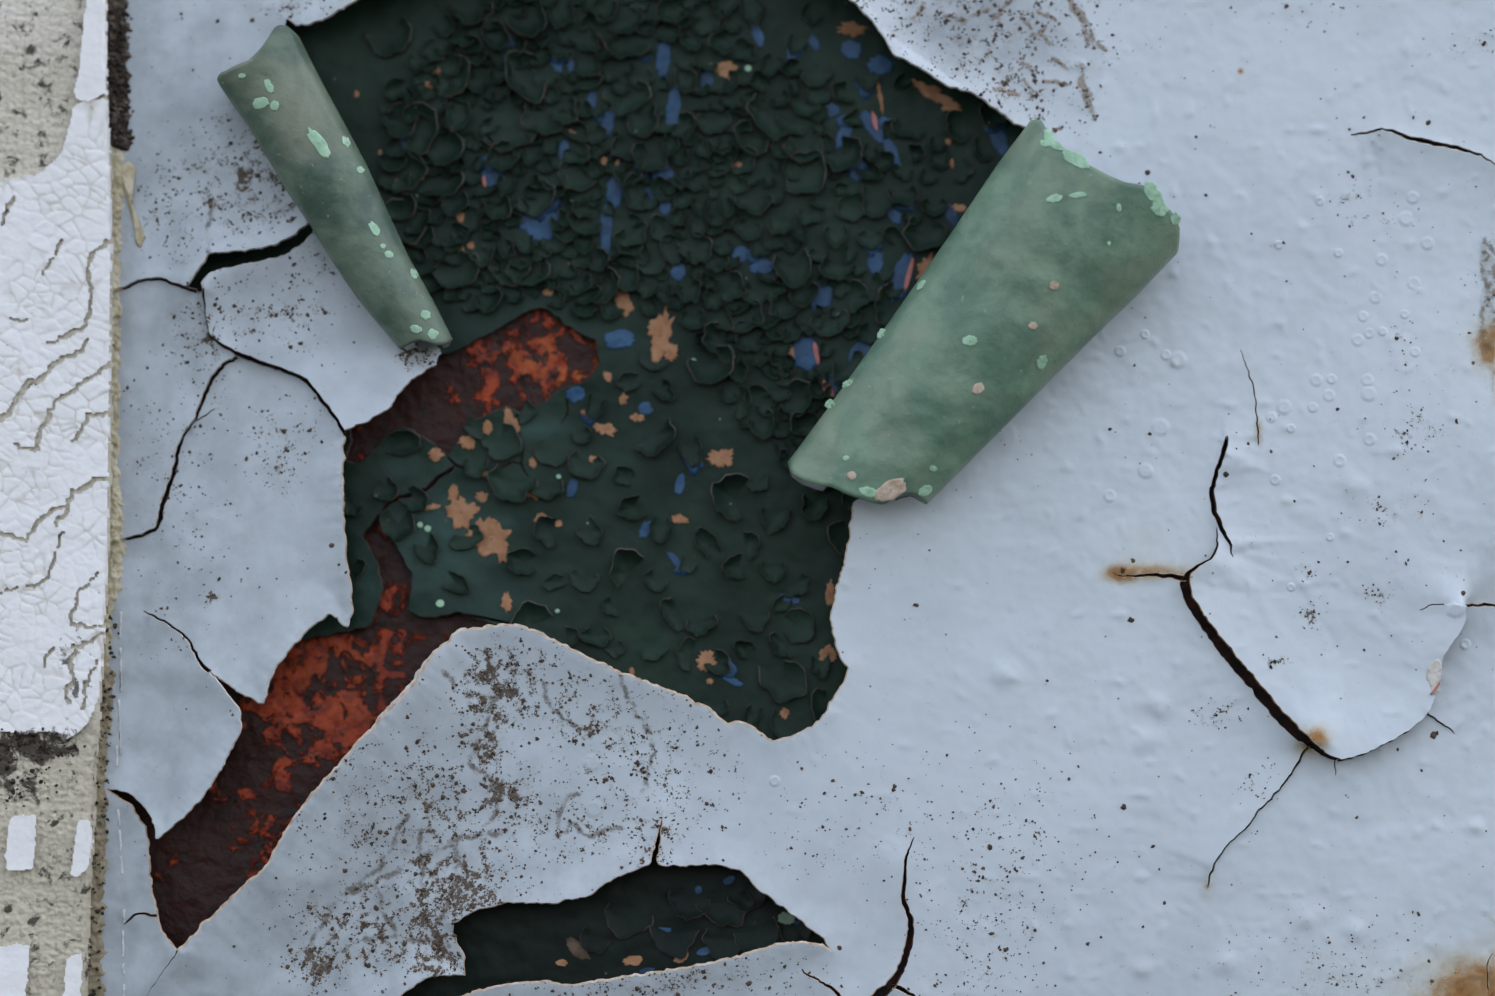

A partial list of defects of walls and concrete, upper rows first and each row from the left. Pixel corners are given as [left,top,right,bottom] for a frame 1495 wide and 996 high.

crack [1351,128,1495,165]
crack [0,0,350,740]
peeling [105,0,1181,951]
corrosion [110,309,599,948]
corrosion [1107,566,1175,581]
crack [1113,351,1454,887]
crack [1420,603,1495,644]
peeling [401,811,834,996]
crack [801,837,916,996]
corrosion [1433,963,1495,996]